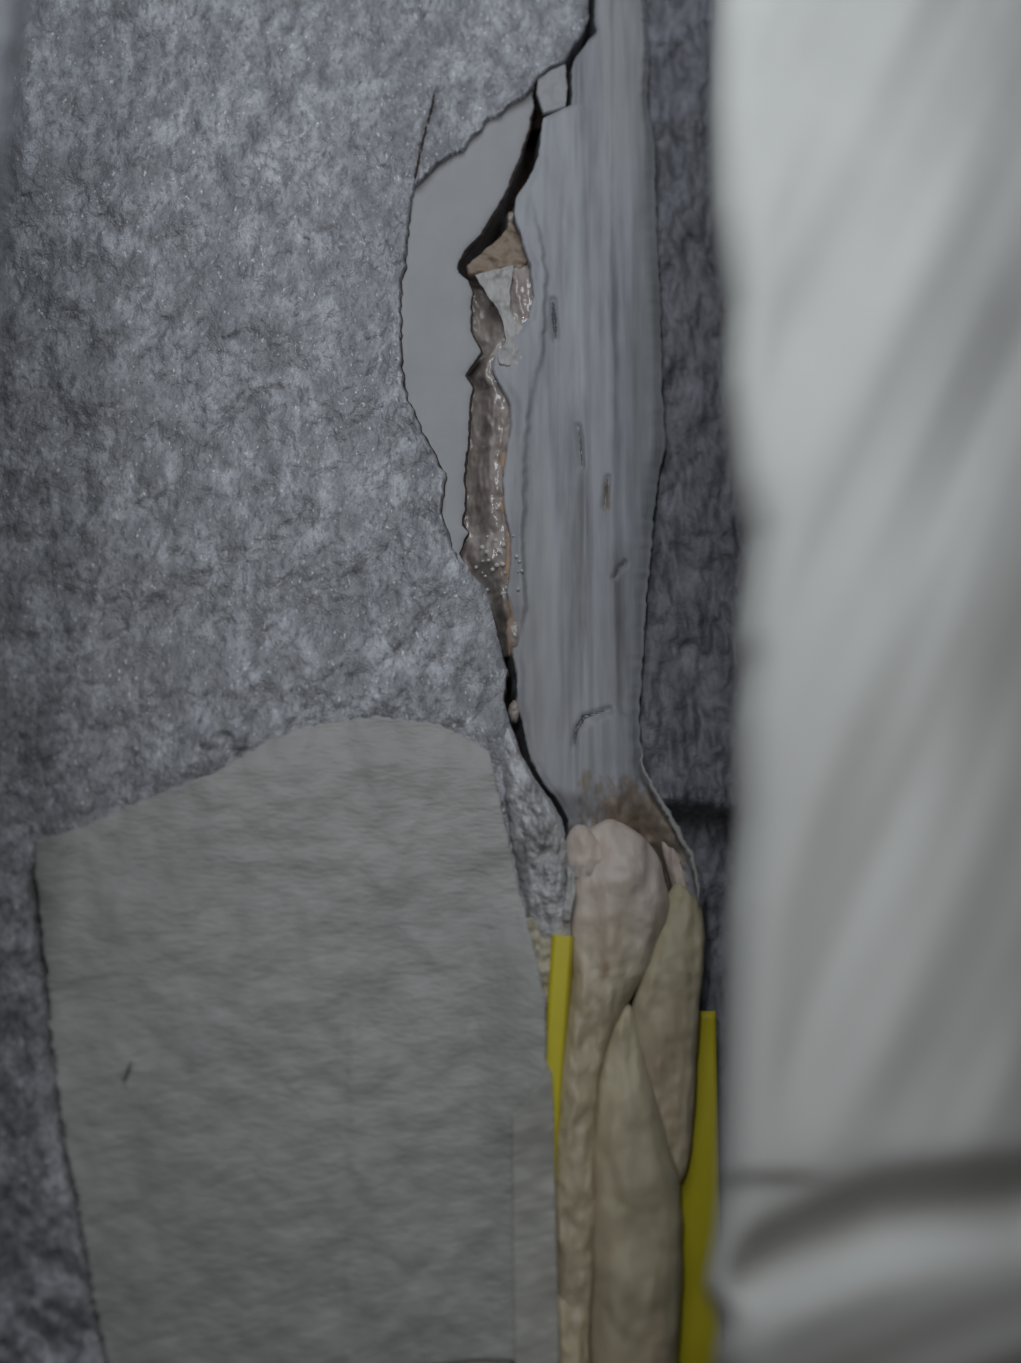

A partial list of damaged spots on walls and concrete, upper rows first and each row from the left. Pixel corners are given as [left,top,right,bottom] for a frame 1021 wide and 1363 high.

flaking render [399,64,567,564]